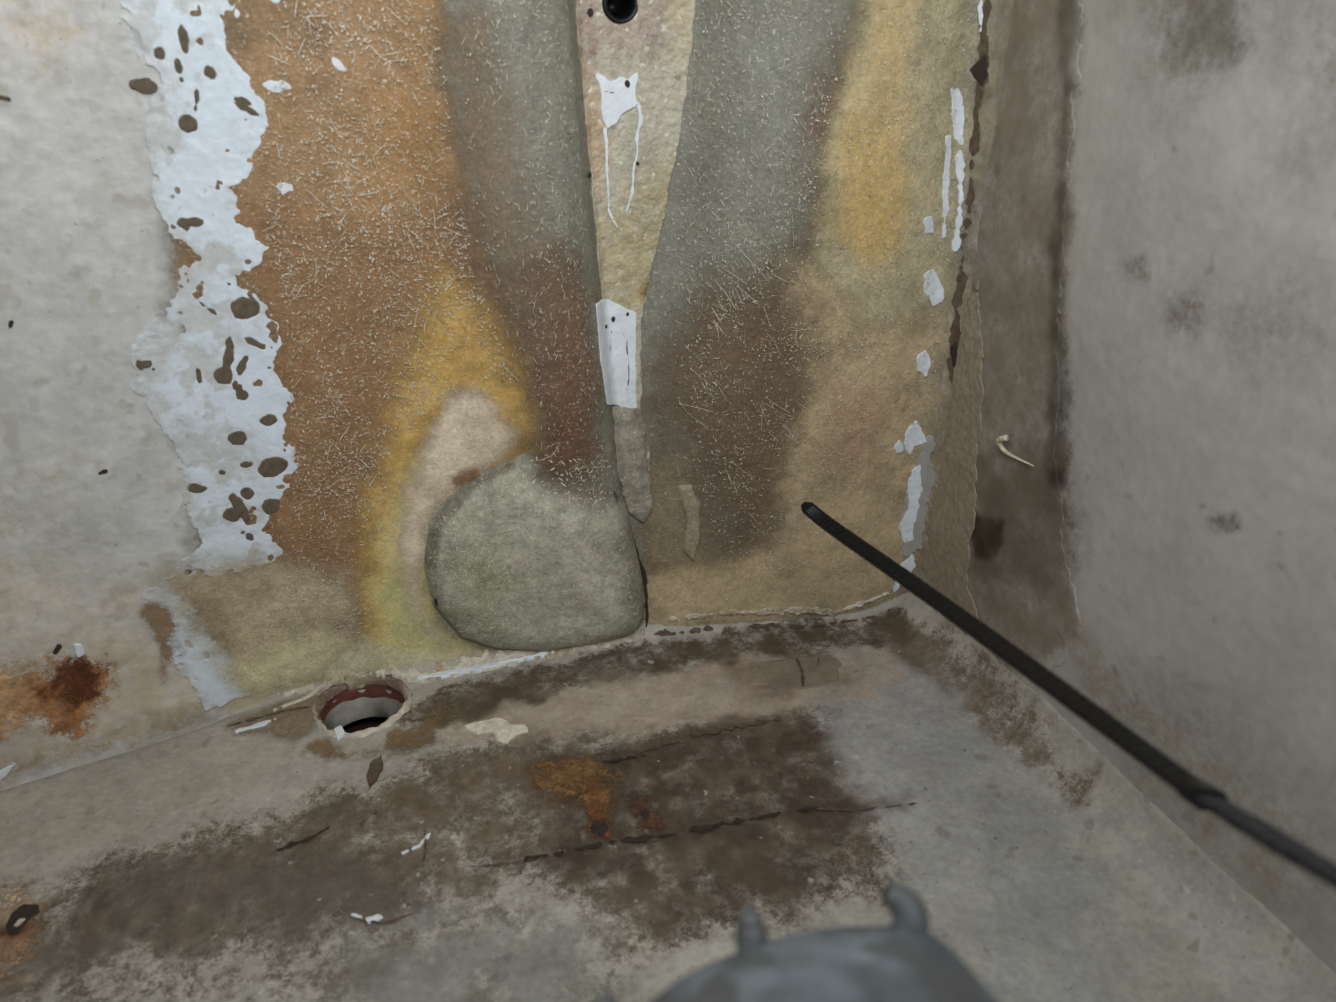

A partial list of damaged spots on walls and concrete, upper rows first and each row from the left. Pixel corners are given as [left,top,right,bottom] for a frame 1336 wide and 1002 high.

water stain [165,0,602,758]
peeling [120,0,985,711]
water stain [612,0,996,627]
crack [947,0,992,383]
corrosion [0,884,50,987]
corrosion [0,643,115,742]
corrosion [529,755,624,838]